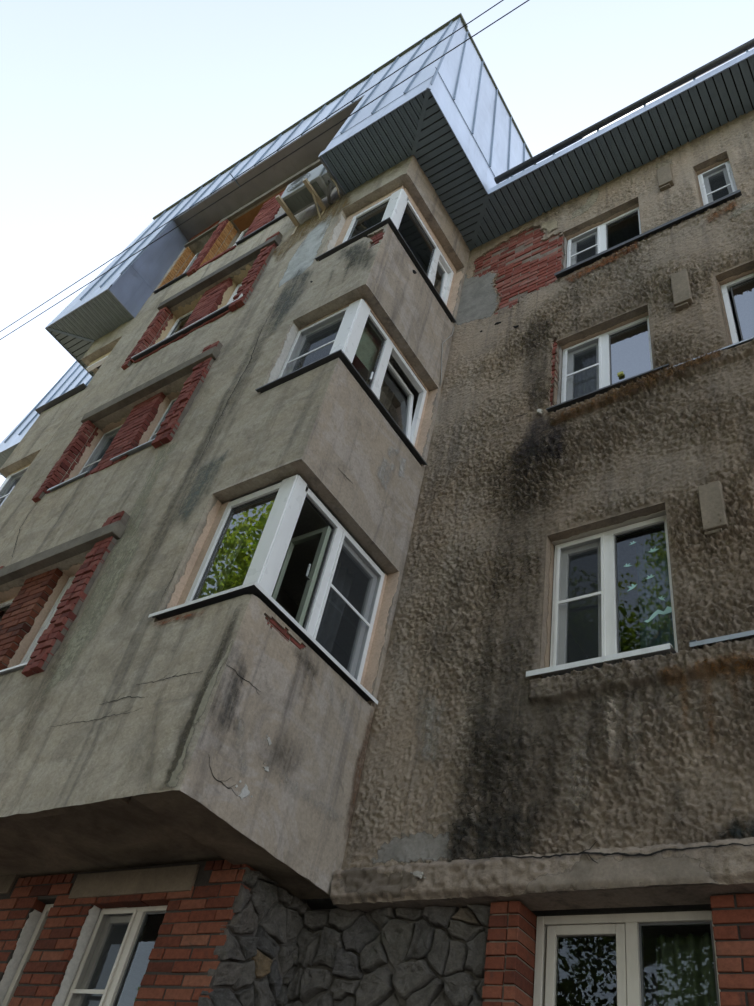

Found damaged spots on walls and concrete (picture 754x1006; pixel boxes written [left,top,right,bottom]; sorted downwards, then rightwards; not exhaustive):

flaking render [474,218,565,315]
crack [48,671,202,728]
crack [463,841,754,863]